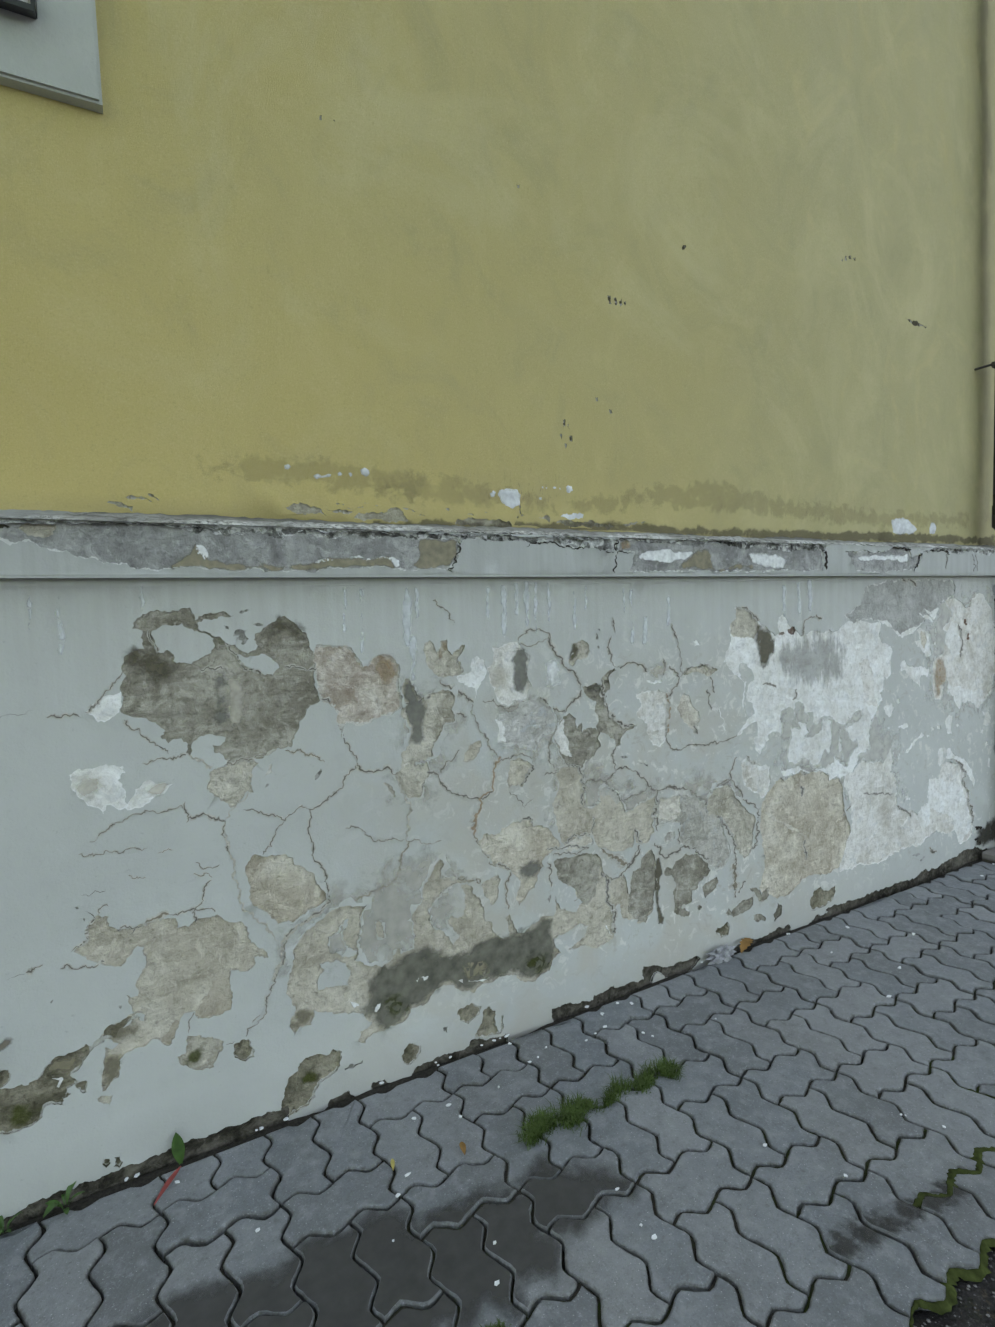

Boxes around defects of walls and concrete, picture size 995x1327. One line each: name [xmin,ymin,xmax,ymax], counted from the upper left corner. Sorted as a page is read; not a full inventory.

spalling [0,494,828,573]
water stain [404,519,995,545]
peeling [69,764,174,812]
spalling [86,607,465,820]
crack [0,618,761,1037]
spalling [245,547,995,1074]
spalling [0,907,268,1135]
spalling [0,1049,363,1233]